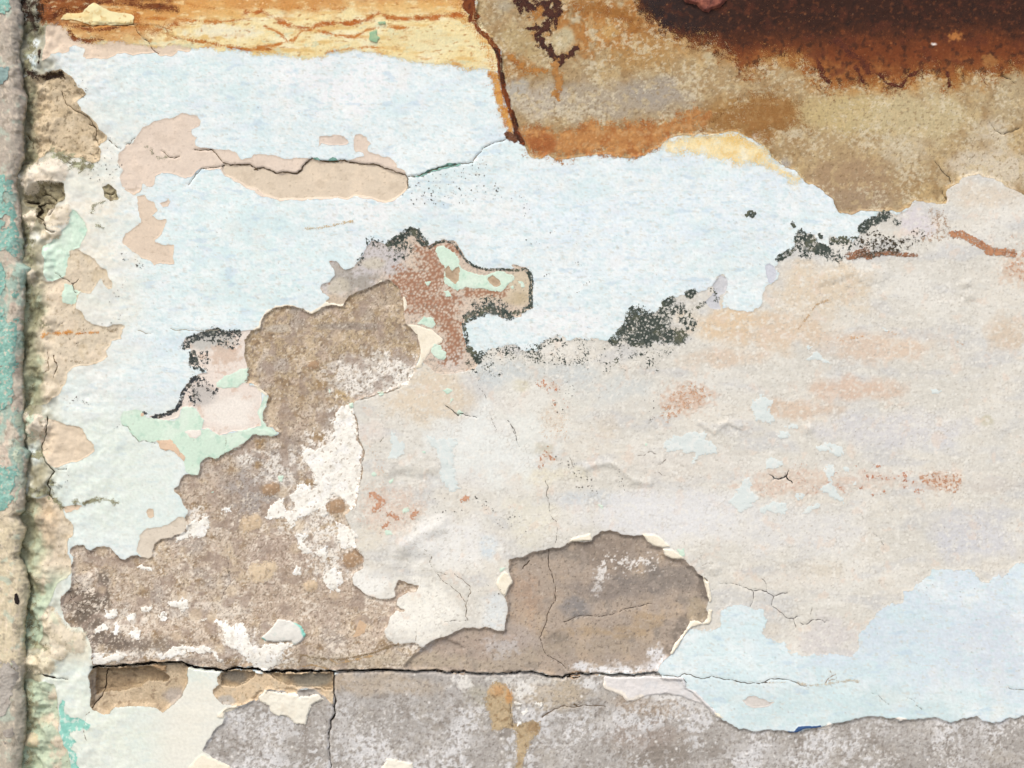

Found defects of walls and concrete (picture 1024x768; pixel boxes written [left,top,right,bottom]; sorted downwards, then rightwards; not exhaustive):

peeling [102,113,461,265]
crack [164,137,509,186]
corrosion [37,0,1024,191]
leakage [775,209,932,264]
leakage [142,325,242,419]
peeling [320,0,1024,676]
flaking render [20,280,1024,768]
crack [83,481,837,767]